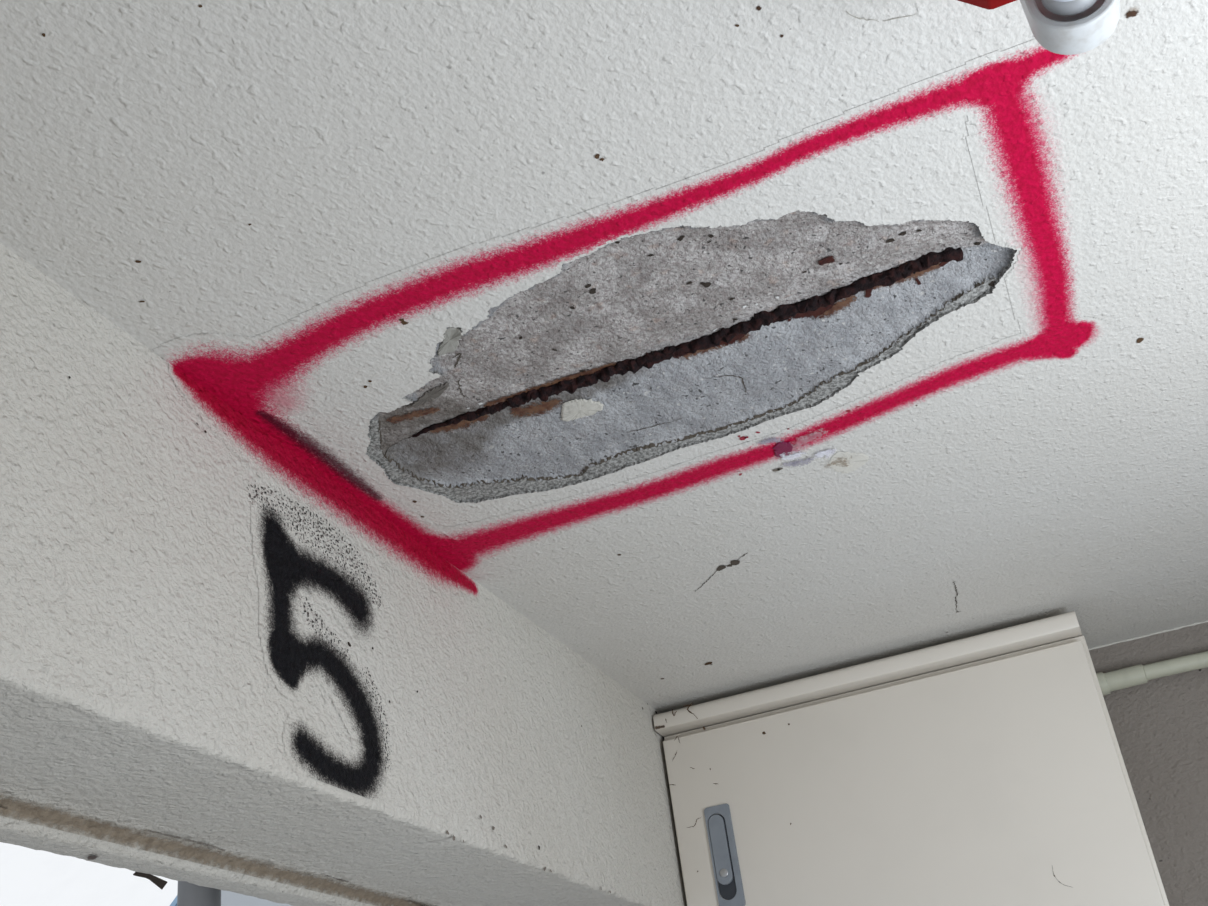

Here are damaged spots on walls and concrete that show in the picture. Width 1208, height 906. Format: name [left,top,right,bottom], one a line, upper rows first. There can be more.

corrosion [788,261,950,322]
spalling [366,210,1017,518]
corrosion [672,334,750,360]
corrosion [386,407,440,424]
corrosion [428,362,616,434]